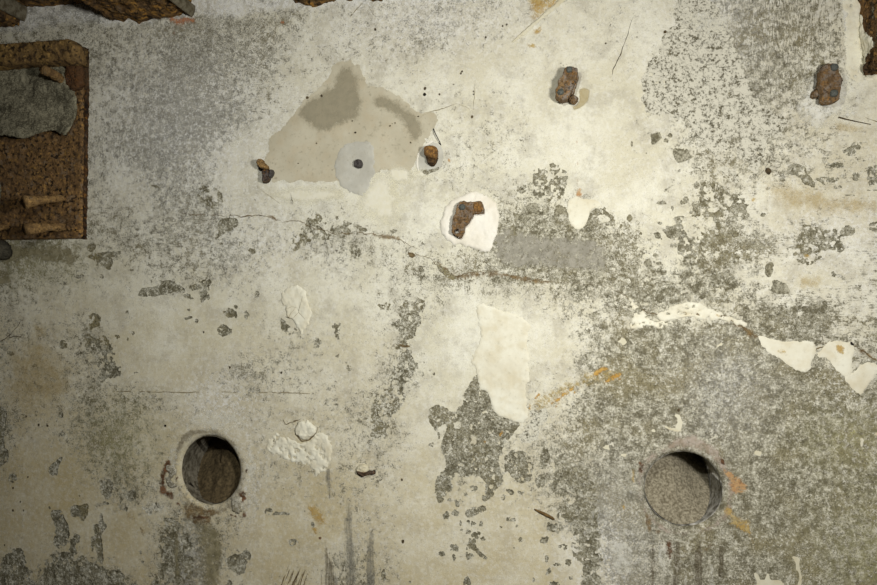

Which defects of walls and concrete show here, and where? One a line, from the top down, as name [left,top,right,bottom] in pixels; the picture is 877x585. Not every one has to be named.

damp [300,68,359,129]
damp [376,98,420,138]
peeling [408,252,425,281]
peeling [138,279,211,333]
peeling [217,305,250,337]
peeling [367,298,425,448]
corrosion [159,460,215,524]
peeling [428,375,603,585]